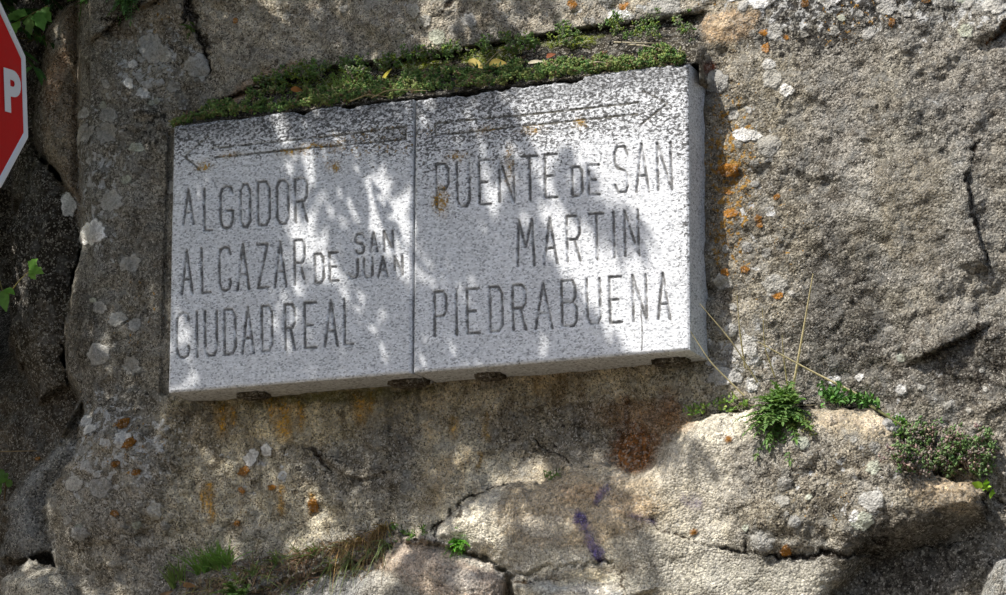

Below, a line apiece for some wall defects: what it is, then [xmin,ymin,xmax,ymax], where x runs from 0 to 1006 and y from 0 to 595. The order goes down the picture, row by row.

crack [94,0,159,41]
crack [181,0,212,72]
crack [985,20,1006,45]
crack [305,446,332,473]
corrosion [612,397,657,472]
crack [430,484,505,543]